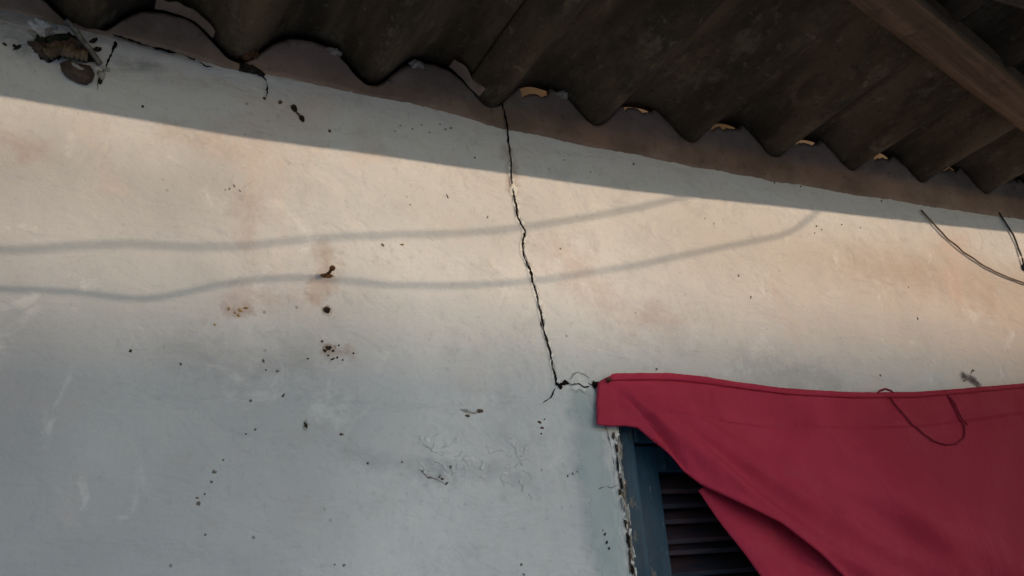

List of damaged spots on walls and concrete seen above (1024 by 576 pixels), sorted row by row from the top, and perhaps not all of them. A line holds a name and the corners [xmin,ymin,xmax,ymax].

spalling [2,17,110,85]
crack [501,103,600,403]
spalling [599,426,637,576]